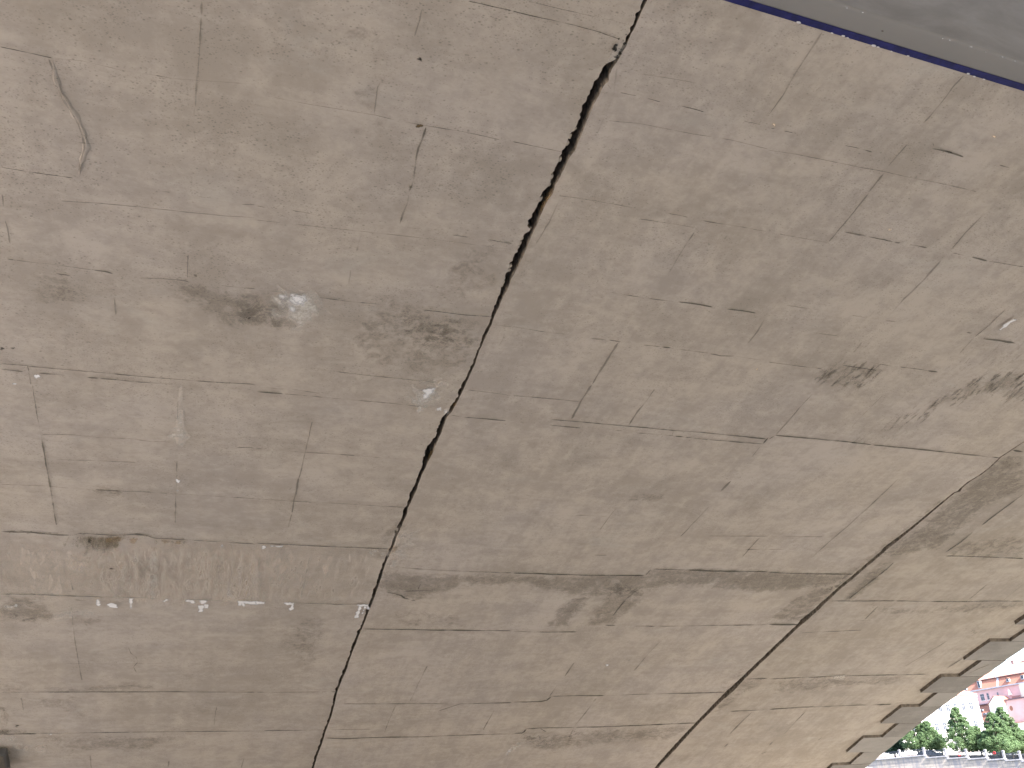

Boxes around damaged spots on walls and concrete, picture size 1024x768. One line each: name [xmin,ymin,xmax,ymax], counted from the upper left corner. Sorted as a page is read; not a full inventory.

water stain [274,294,317,324]
crack [3,0,703,768]
crack [493,420,1023,768]